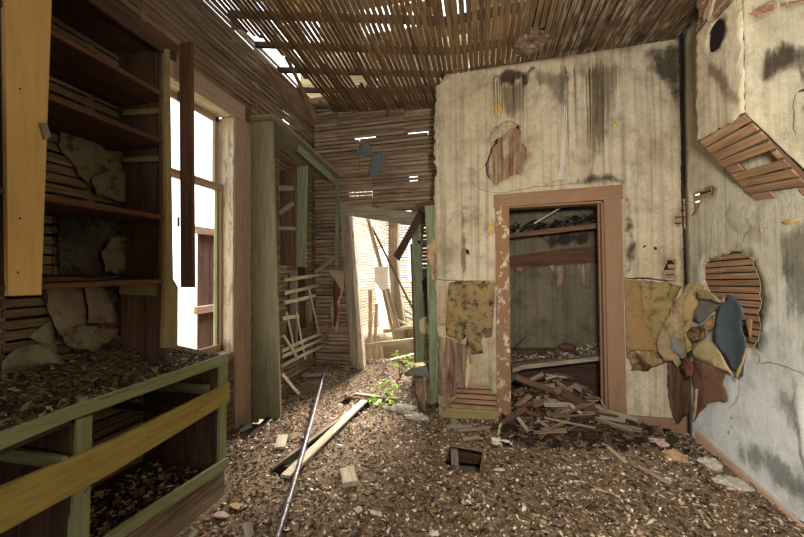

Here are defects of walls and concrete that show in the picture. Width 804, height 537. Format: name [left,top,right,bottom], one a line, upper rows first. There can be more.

leakage [500,68,531,85]
leakage [652,47,682,97]
crack [793,89,804,134]
flaking render [485,103,528,186]
flaking render [673,185,712,229]
flaking render [702,249,762,350]